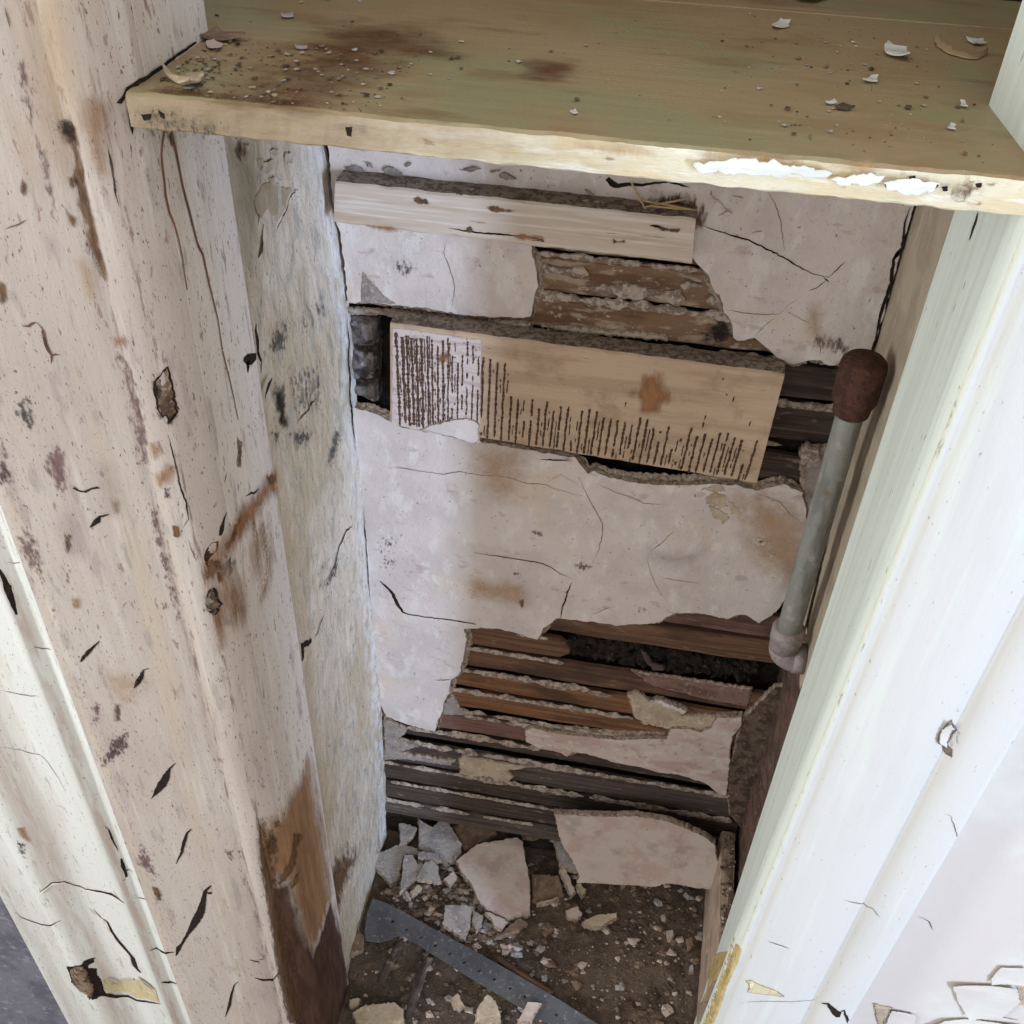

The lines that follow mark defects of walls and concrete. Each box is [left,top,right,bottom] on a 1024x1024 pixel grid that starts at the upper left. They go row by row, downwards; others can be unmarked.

leakage [158,88,236,99]
leakage [251,30,436,112]
peeling [693,153,940,196]
crack [698,195,845,353]
crack [871,208,910,349]
rust [206,471,278,593]
crack [329,505,476,625]
crack [483,554,572,615]
spalling [382,627,783,828]
leakage [258,761,356,1024]
spalling [67,957,160,1004]
peeling [940,967,1024,1024]